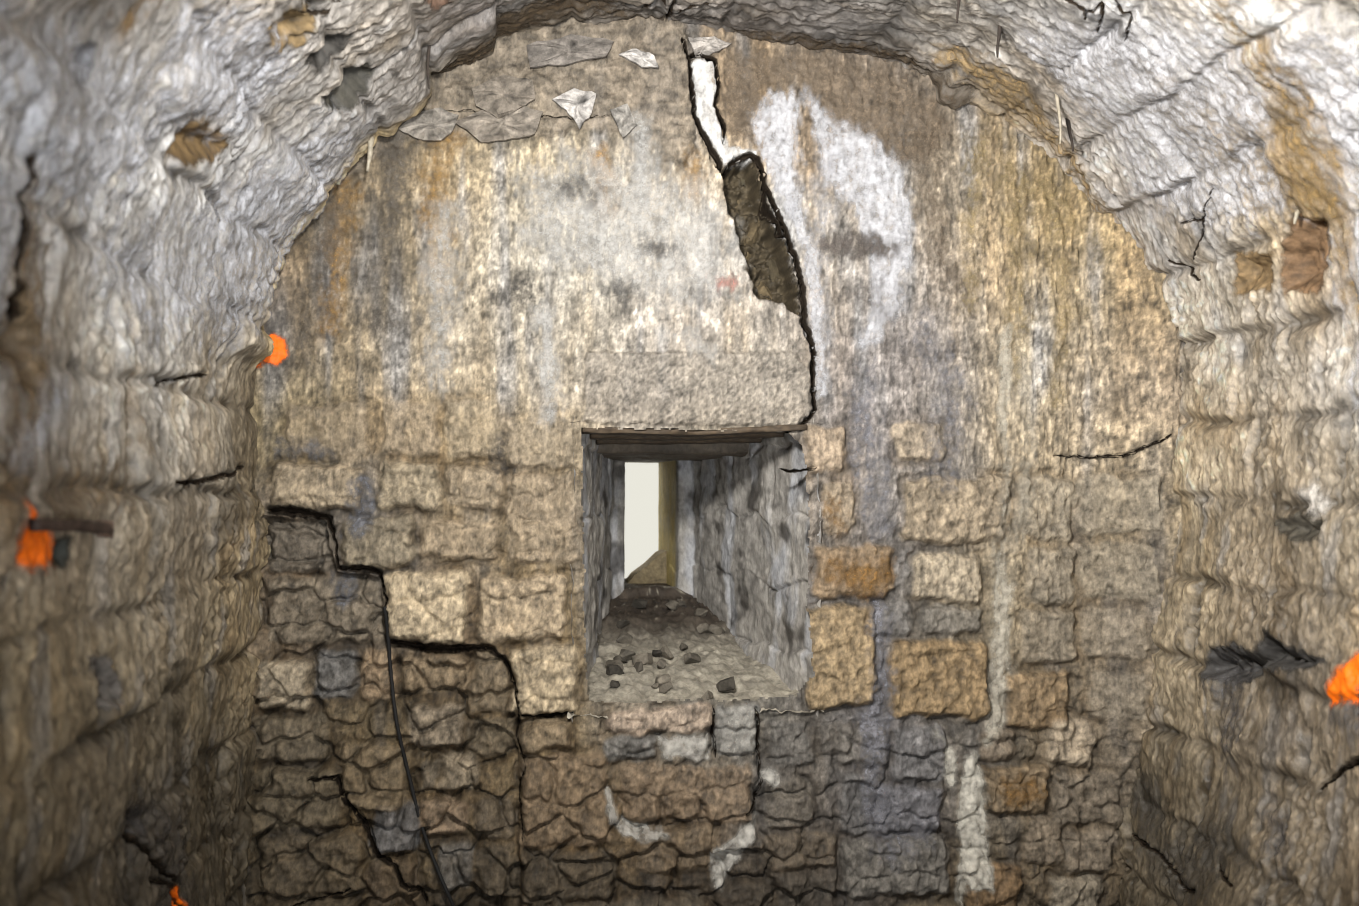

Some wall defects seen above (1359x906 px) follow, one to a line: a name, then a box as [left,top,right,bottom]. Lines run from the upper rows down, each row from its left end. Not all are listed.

flaking render [398,34,658,143]
damp [440,0,641,73]
flaking render [610,104,646,187]
damp [727,30,972,263]
crack [641,0,817,434]
peeling [688,36,911,395]
damp [999,328,1011,430]
crack [268,505,573,842]
damp [945,554,1012,901]
crack [293,888,351,906]
crack [307,775,435,906]